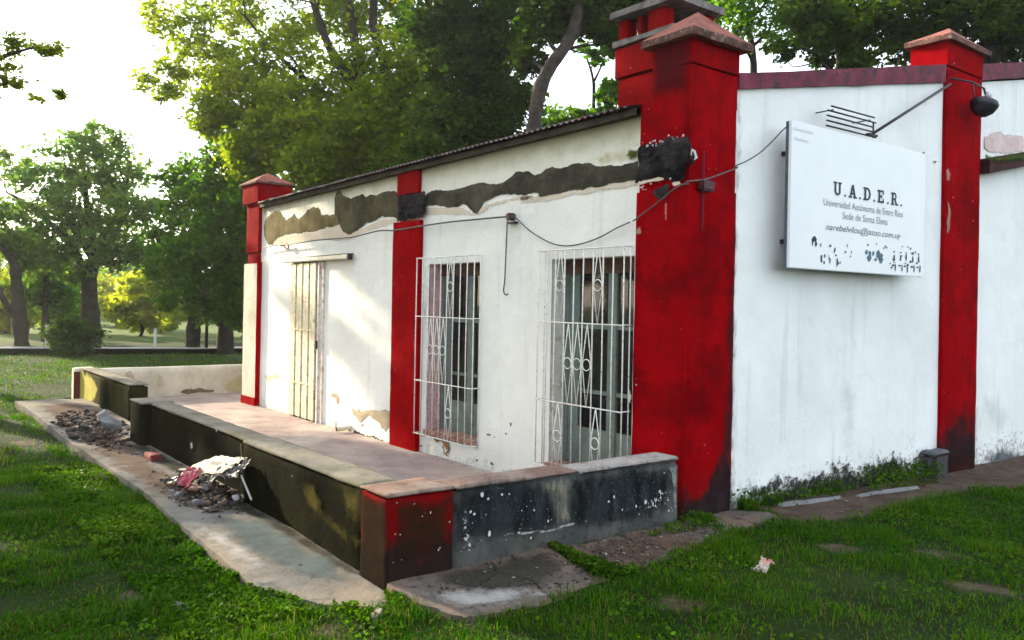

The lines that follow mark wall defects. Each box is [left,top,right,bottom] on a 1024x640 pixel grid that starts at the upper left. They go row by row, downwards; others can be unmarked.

peeling [985,132,1024,154]
flaking render [264,134,698,245]
flaking render [351,407,389,431]
leakage [456,467,731,552]